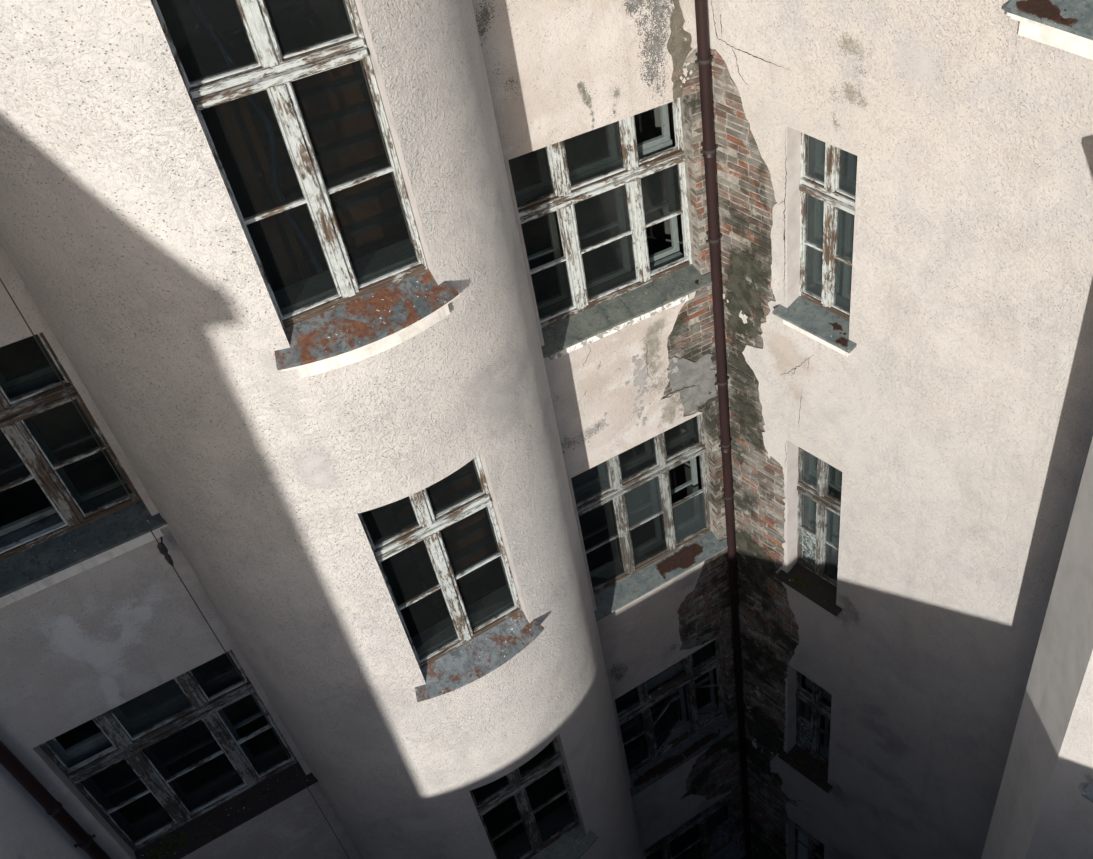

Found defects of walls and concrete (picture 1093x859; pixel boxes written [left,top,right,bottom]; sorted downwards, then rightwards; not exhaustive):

damp [621,0,677,107]
crack [711,1,790,86]
rust [1016,0,1078,27]
spalling [615,0,799,859]
rust [656,543,703,579]